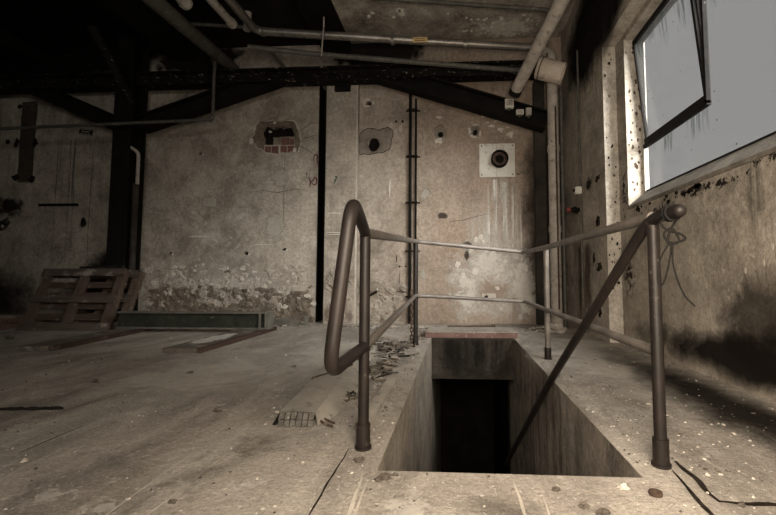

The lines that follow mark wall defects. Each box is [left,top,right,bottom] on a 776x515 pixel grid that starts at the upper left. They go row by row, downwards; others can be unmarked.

flaking render [249,120,315,155]
water stain [0,198,23,231]
water stain [448,155,536,320]
water stain [636,152,776,215]
peeling [142,253,316,322]
peeling [324,265,336,321]
peeling [370,278,408,323]
water stain [663,283,776,444]
crack [308,449,349,515]